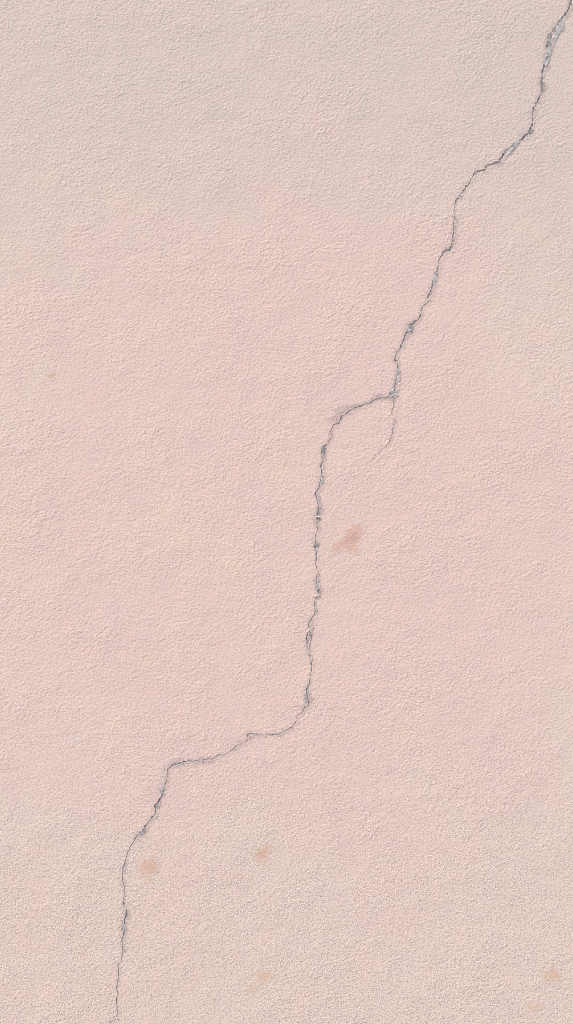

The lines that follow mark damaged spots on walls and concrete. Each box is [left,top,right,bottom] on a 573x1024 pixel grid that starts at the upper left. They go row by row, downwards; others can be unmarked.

crack [432,0,573,281]
crack [109,277,435,1024]